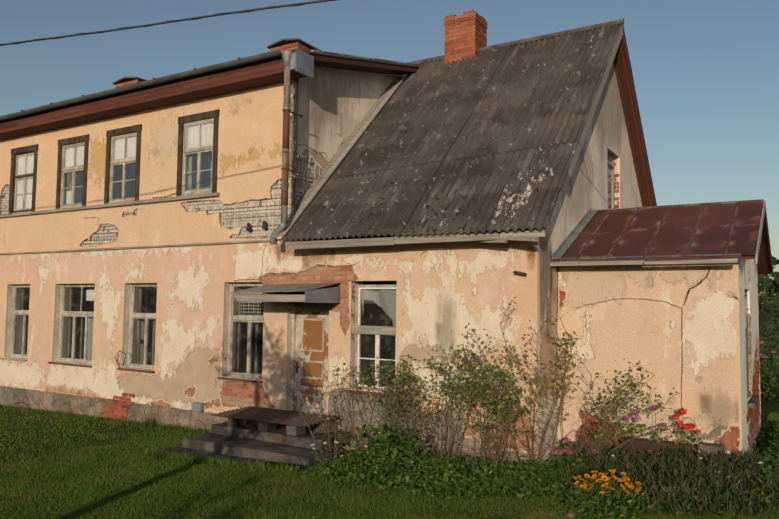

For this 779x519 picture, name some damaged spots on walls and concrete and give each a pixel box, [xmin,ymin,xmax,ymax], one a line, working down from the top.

flaking render [0,223,275,421]
peeling [180,79,538,451]
crack [557,266,722,440]
peeling [539,264,741,405]
peeling [575,309,761,452]